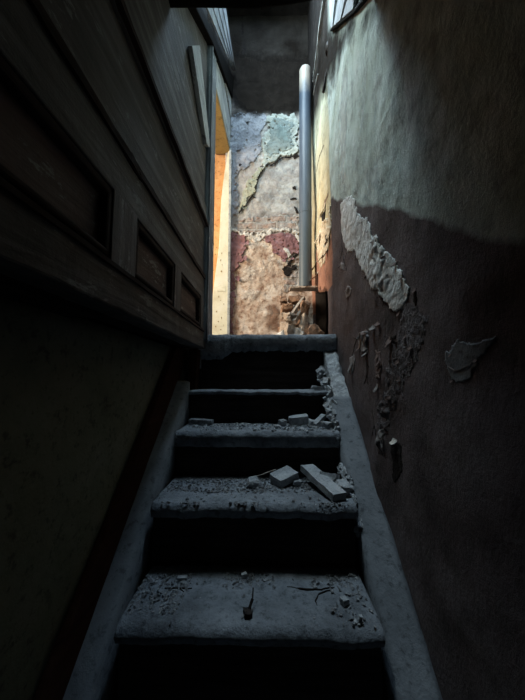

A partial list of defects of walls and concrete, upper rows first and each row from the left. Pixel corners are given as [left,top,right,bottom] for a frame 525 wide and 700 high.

peeling [215,112,299,335]
peeling [337,195,417,317]
flaking render [375,429,403,483]